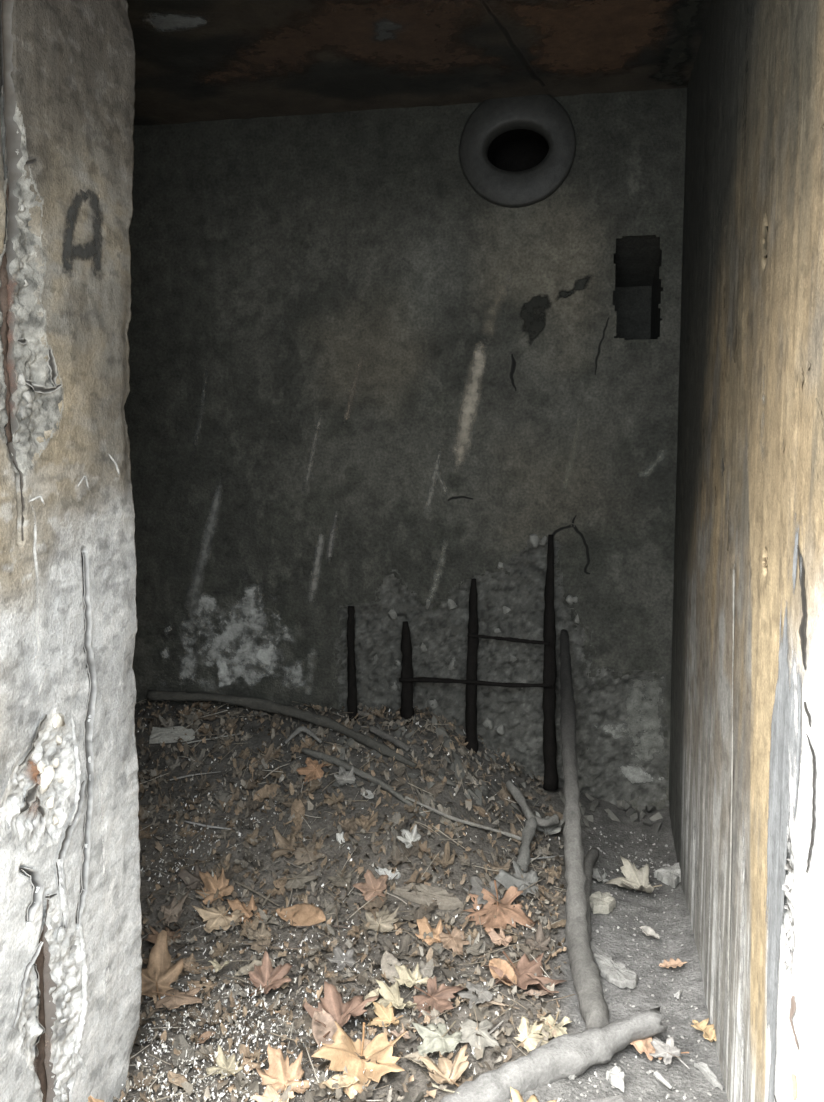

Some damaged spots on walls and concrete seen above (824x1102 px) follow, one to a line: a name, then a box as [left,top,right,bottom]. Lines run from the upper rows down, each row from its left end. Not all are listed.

spalling [0,85,64,475]
peeling [520,276,591,344]
damp [180,486,314,693]
damp [310,514,337,599]
peeling [792,528,802,591]
spalling [0,703,76,853]
crack [19,552,97,1102]
peeling [766,606,802,1102]
spalling [13,901,83,1102]